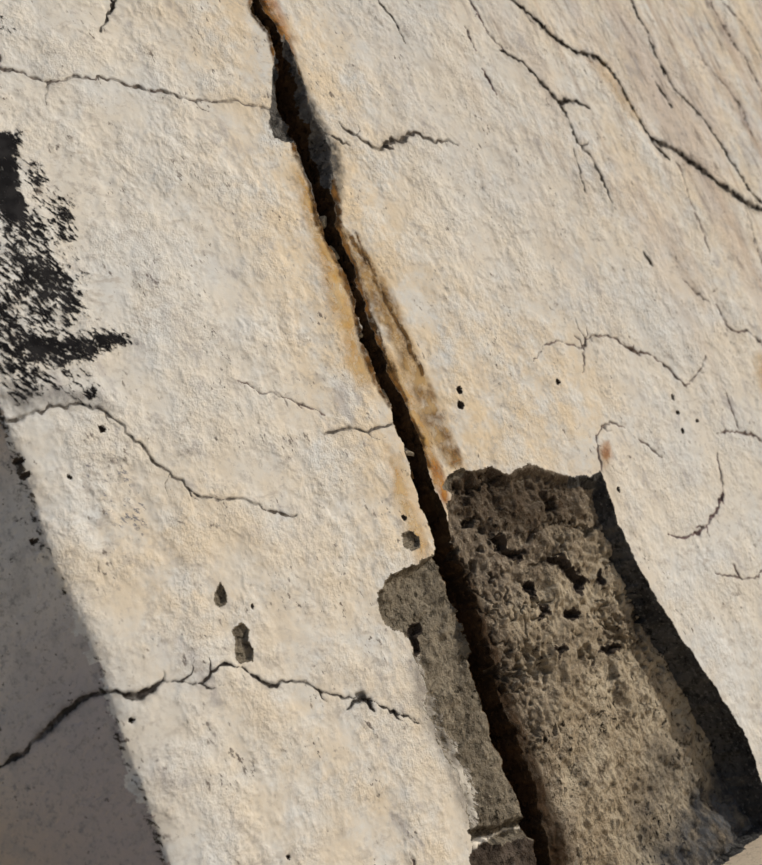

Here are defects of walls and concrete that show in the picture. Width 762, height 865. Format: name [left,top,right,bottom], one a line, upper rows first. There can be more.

crack [0,54,253,112]
crack [464,5,616,210]
crack [511,0,762,251]
rust [299,177,365,374]
crack [7,402,236,501]
crack [238,0,550,865]
rust [388,359,448,502]
crack [668,455,725,539]
crack [0,658,419,768]
spalling [214,582,228,607]
spalling [232,622,254,664]
spalling [377,463,762,865]